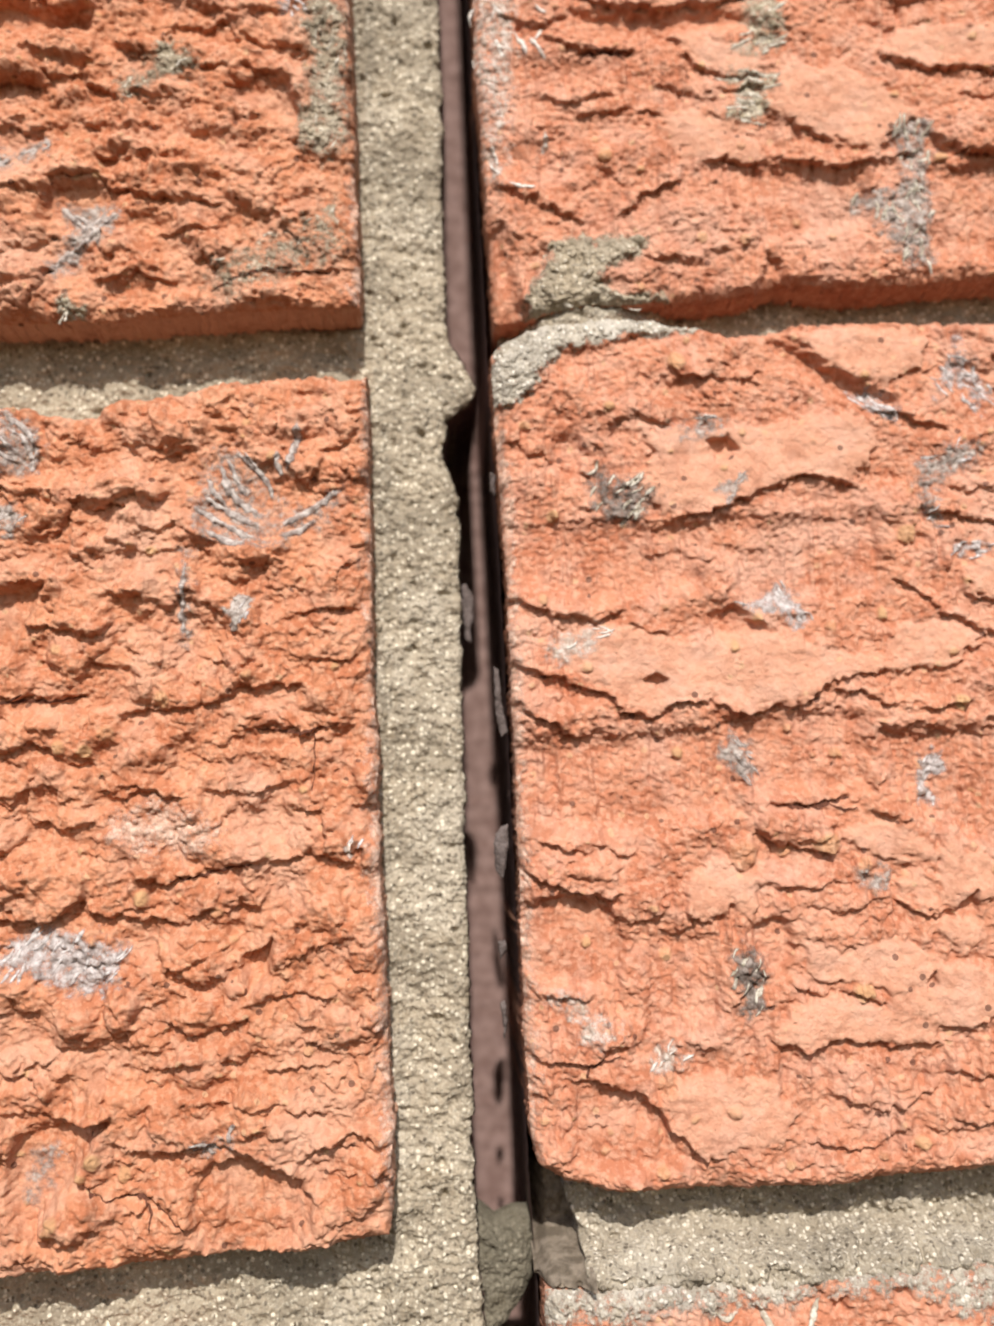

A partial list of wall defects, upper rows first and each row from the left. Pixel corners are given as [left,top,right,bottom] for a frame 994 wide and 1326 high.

crack [437,0,620,1326]